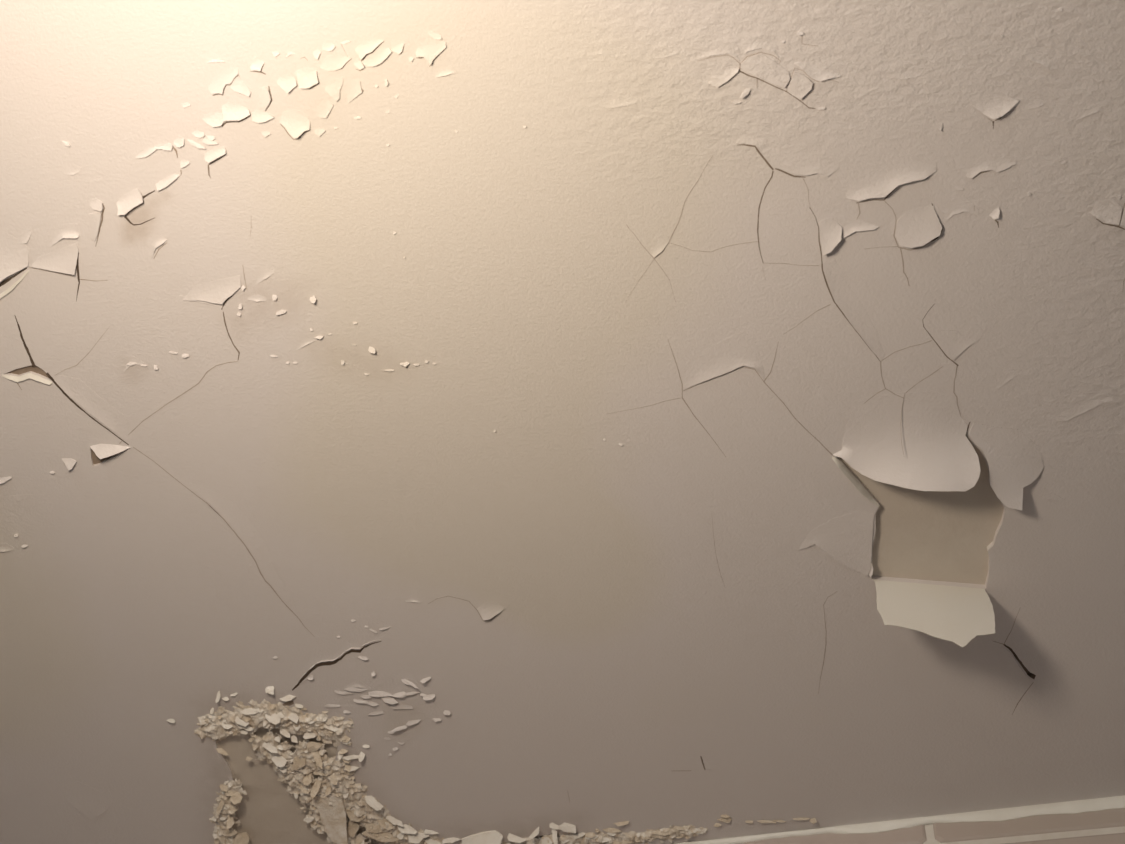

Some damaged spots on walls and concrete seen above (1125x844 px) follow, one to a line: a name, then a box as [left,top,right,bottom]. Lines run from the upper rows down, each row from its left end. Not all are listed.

peeling [117,31,457,225]
peeling [697,34,841,110]
peeling [0,231,29,299]
peeling [237,270,286,316]
crack [608,125,983,457]
peeling [820,154,1000,285]
crack [1091,197,1125,230]
crack [2,268,390,691]
peeling [799,391,1044,648]
crack [406,596,505,621]
crack [994,609,1036,713]
spalling [194,671,817,844]